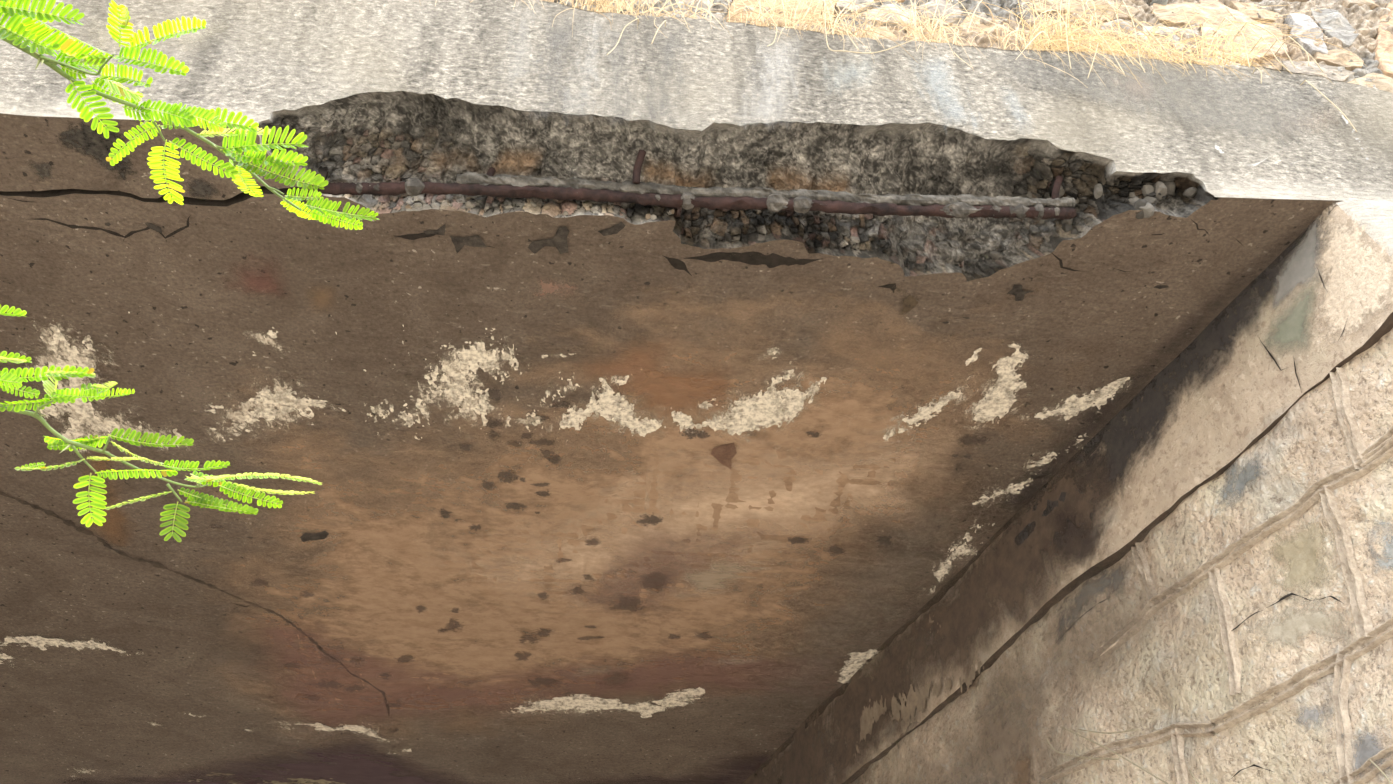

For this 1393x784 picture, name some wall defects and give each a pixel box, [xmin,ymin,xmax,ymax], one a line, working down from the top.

crack [0,166,329,241]
spalling [257,91,1216,282]
peeling [249,322,282,356]
crack [1259,338,1301,389]
peeling [194,378,346,442]
damp [482,401,570,464]
peeling [364,328,827,469]
damp [483,469,549,514]
damp [631,215,1323,784]
crack [0,491,390,717]
crack [1231,593,1344,631]
damp [132,745,459,784]